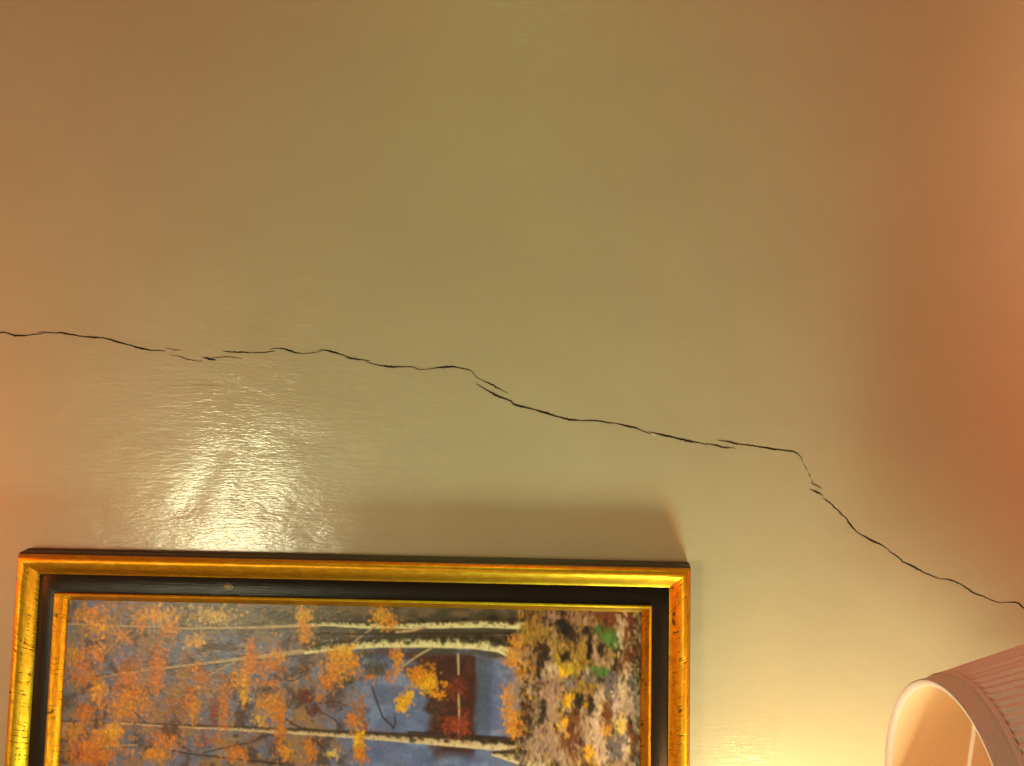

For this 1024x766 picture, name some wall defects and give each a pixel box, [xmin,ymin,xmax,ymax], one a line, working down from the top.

crack [0,330,1024,609]